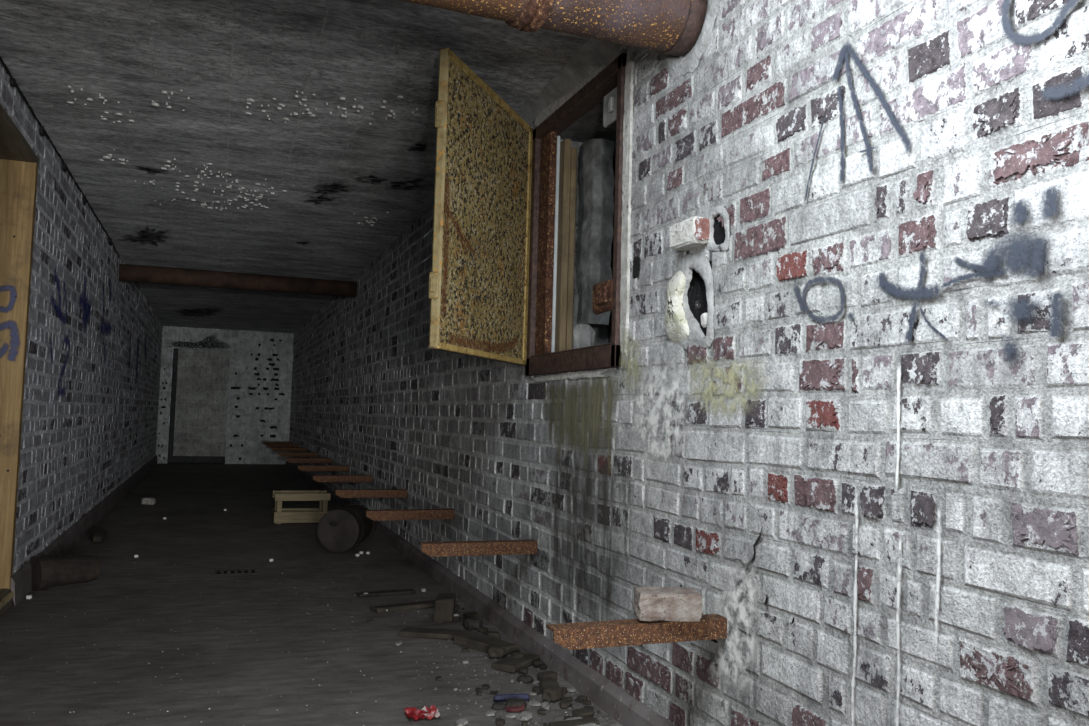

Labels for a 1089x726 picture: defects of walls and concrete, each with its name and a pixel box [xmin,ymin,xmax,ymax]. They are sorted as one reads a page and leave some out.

corrosion [441,177,475,313]
corrosion [450,334,517,352]
spalling [678,206,734,362]